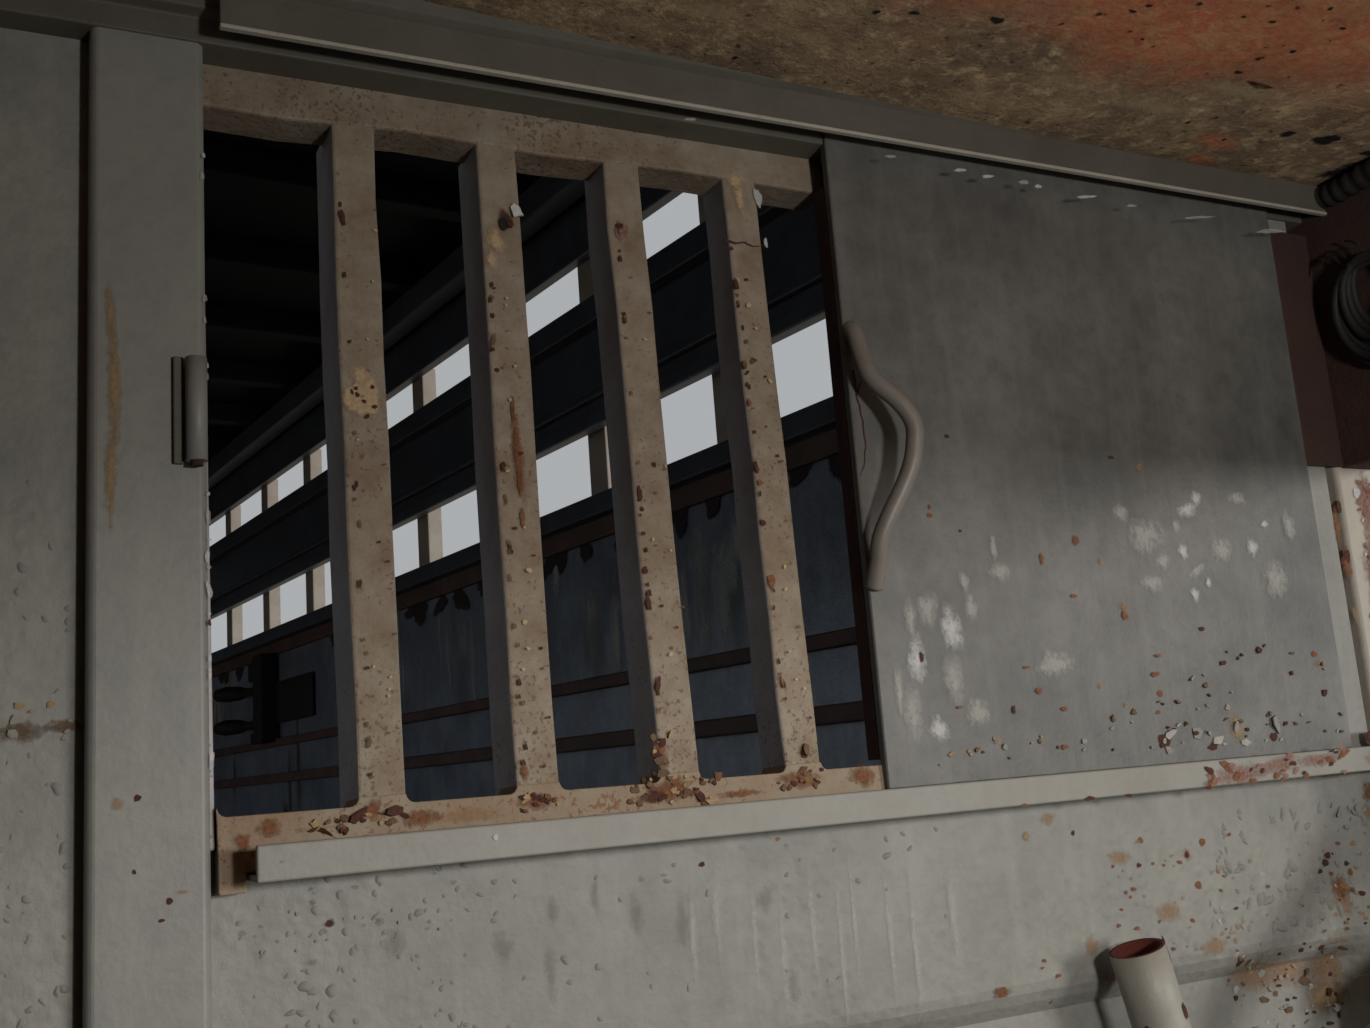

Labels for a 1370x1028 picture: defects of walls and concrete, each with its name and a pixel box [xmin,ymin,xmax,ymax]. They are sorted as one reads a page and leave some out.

corrosion [236,719,300,850]
corrosion [301,801,437,836]
corrosion [519,765,561,813]
corrosion [627,730,758,806]
corrosion [777,743,824,792]
peeling [1150,674,1350,788]